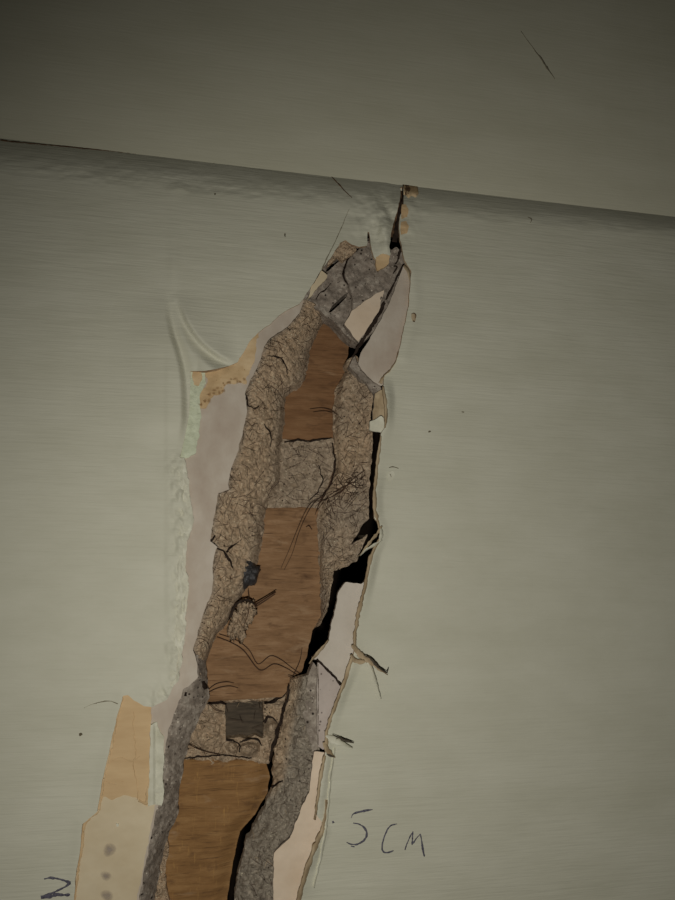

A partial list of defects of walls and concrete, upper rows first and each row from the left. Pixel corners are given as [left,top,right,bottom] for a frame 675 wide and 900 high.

spalling [74,238,416,900]
crack [352,184,419,358]